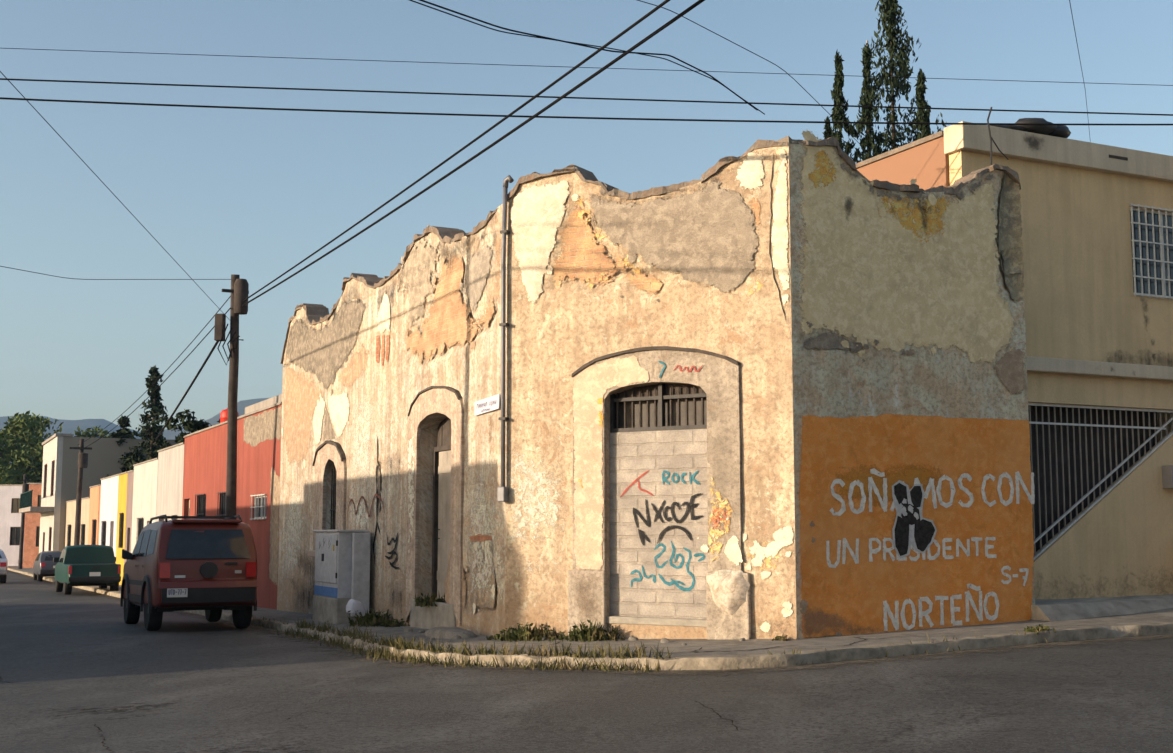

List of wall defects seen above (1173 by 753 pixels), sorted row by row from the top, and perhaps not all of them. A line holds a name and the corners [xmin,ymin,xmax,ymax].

flaking render [405,180,662,364]
flaking render [735,129,1026,394]
flaking render [243,293,390,470]
flaking render [269,467,280,585]
spalling [463,534,504,614]
spalling [751,599,808,636]